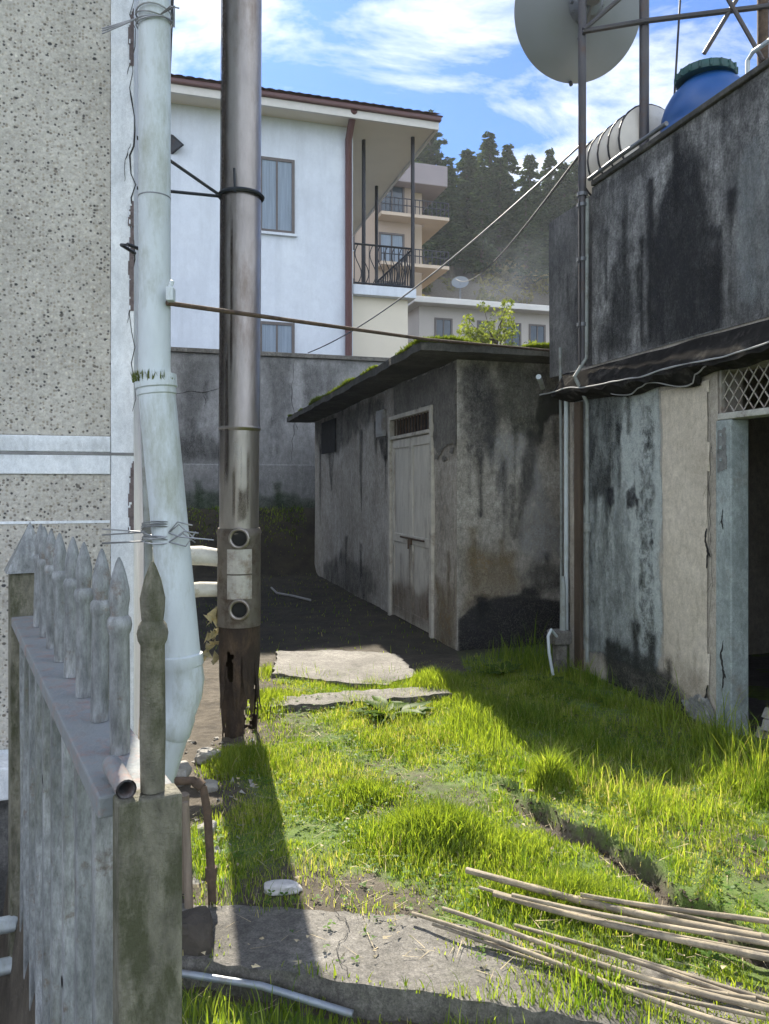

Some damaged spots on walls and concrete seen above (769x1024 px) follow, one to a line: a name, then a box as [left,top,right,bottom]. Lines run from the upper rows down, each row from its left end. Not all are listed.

water stain [567,136,736,362]
corrosion [220,658,241,709]
water stain [316,400,388,498]
water stain [436,363,653,651]
water stain [594,559,687,715]
crack [704,426,726,698]